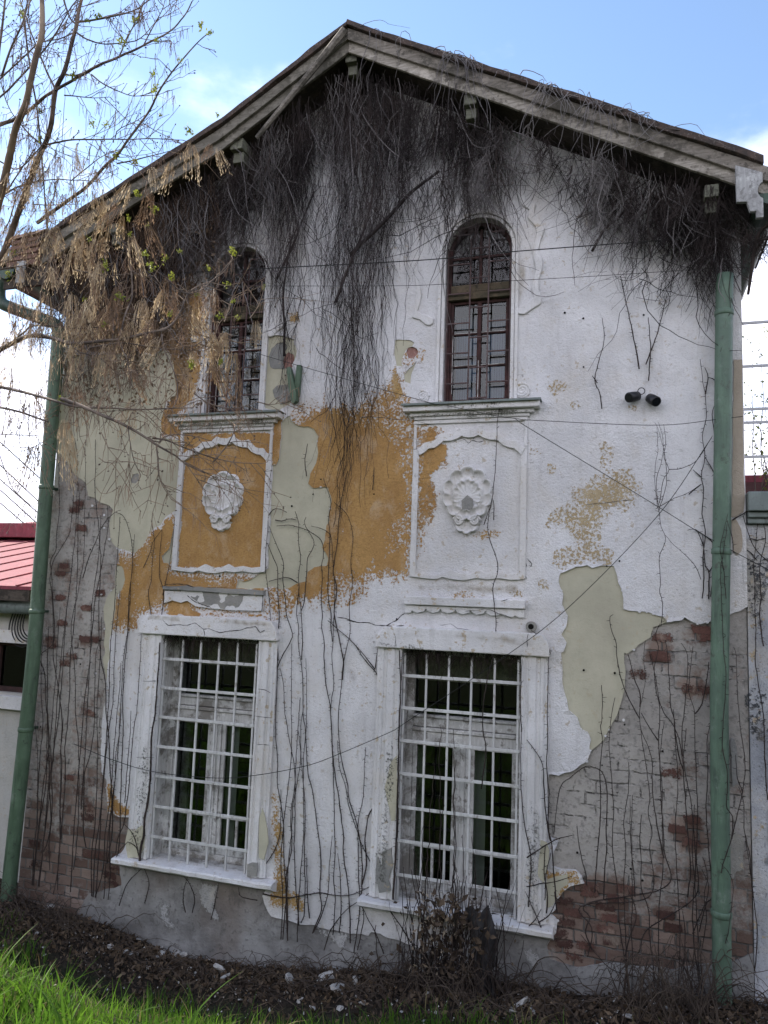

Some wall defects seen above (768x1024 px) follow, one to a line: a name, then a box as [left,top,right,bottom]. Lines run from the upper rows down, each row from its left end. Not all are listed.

flaking render [17,268,464,975]
flaking render [492,441,712,998]
flaking render [729,608,754,1002]